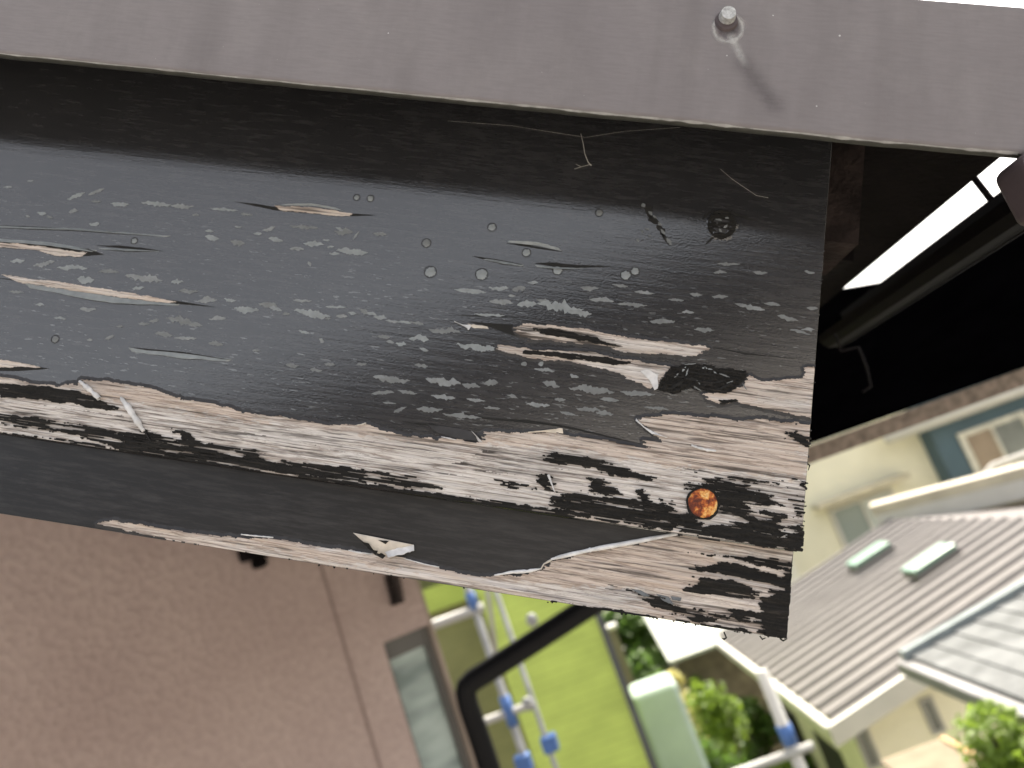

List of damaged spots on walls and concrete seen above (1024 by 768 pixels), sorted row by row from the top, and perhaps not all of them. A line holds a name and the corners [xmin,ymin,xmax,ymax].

peeling [205,207,368,256]
peeling [0,259,815,639]